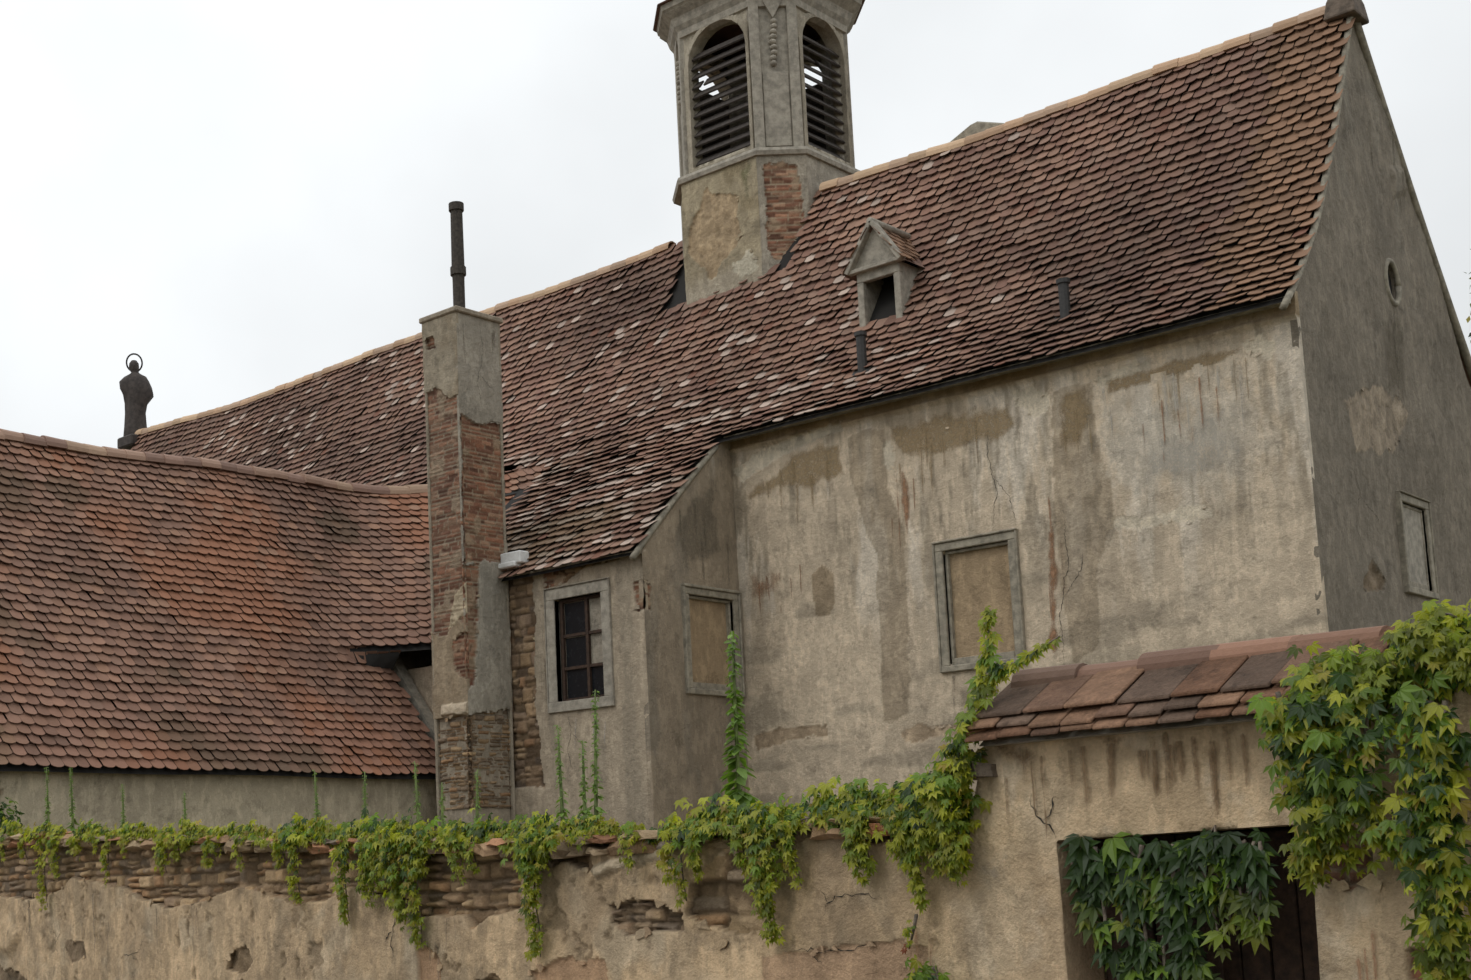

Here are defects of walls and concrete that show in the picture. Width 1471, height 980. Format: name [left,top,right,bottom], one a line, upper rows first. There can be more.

spalling [425,385,507,686]
spalling [437,559,616,810]
leakage [1139,732,1248,809]
spalling [0,845,593,923]
spalling [612,847,769,940]
flaking render [0,964,27,980]
spalling [65,939,86,962]
spalling [225,946,253,973]